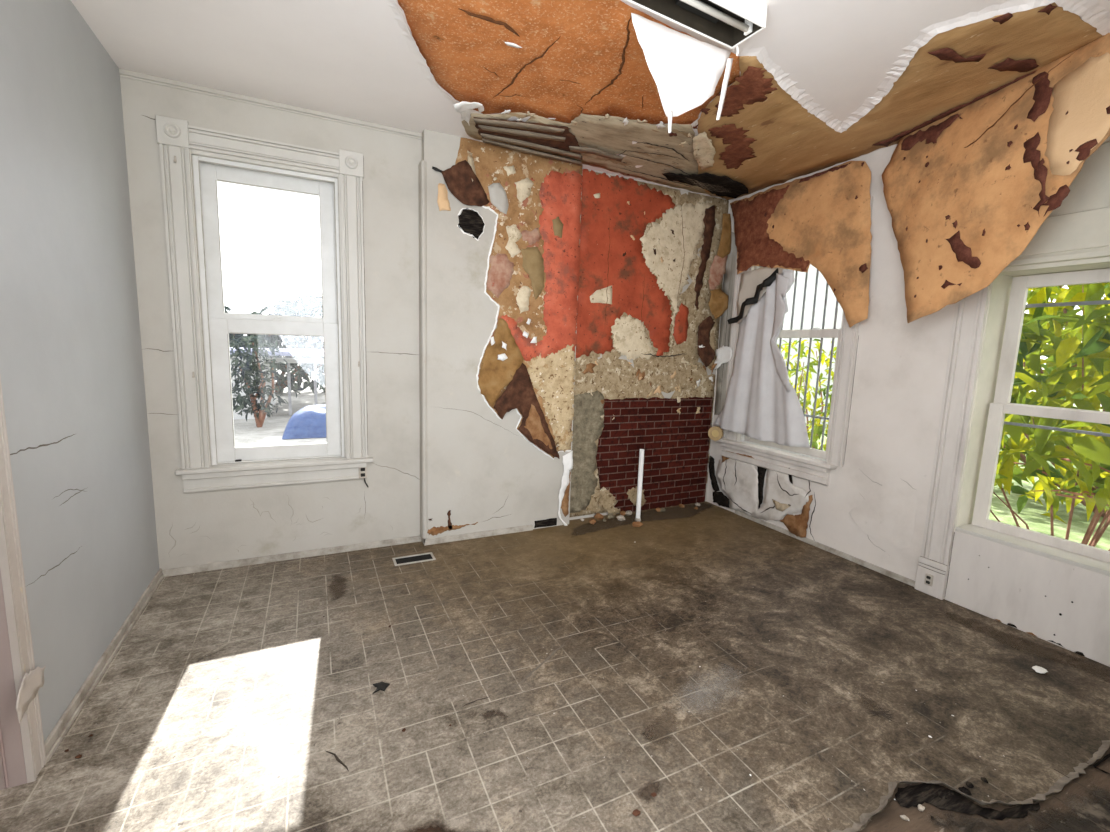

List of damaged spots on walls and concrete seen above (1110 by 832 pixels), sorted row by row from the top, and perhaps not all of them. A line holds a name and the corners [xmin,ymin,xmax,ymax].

peeling [387,0,740,129]
spalling [455,138,732,528]